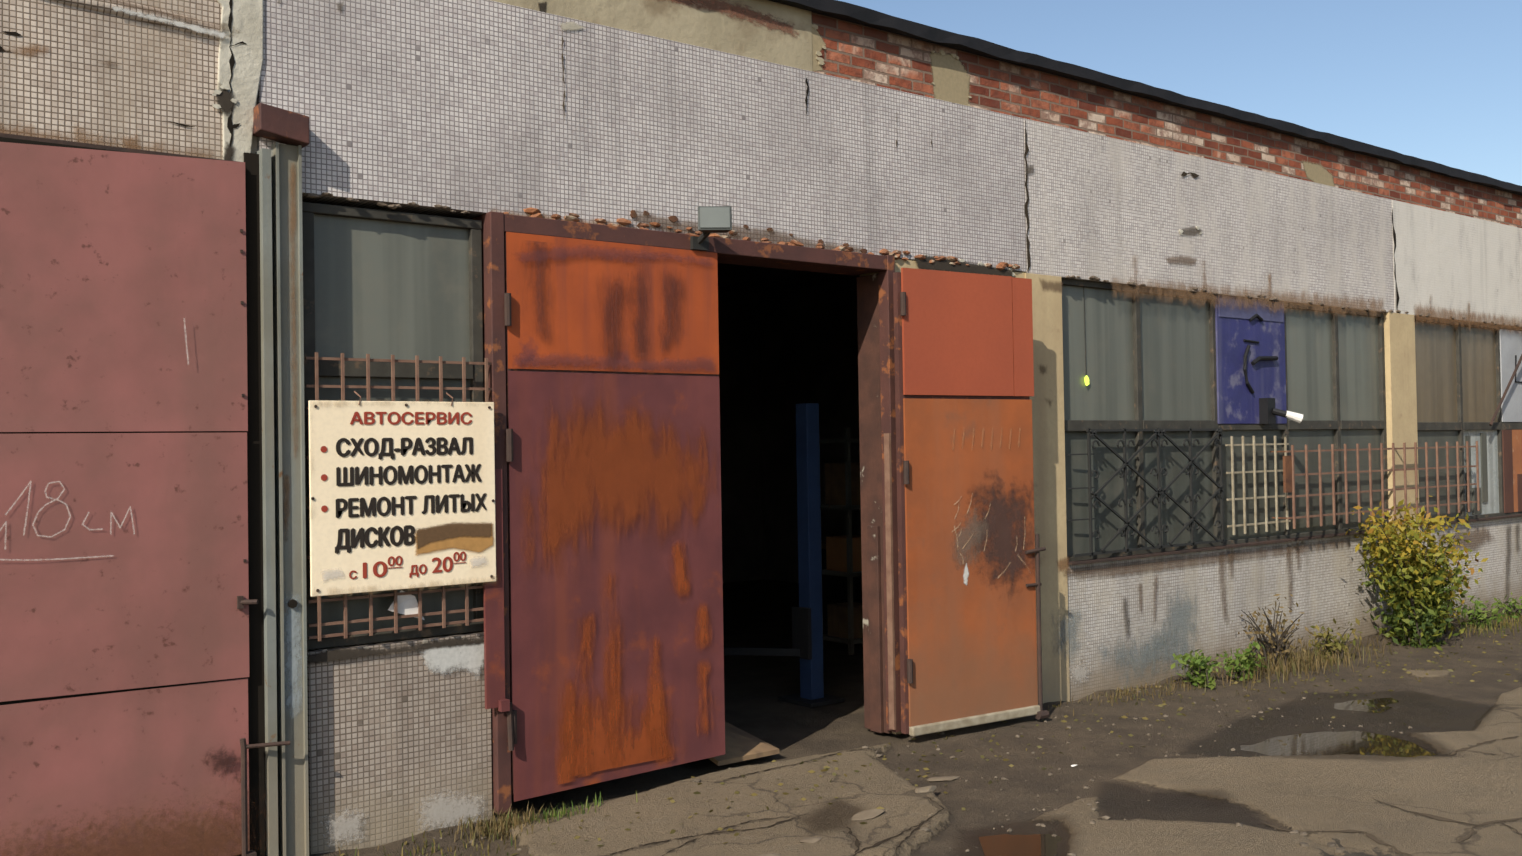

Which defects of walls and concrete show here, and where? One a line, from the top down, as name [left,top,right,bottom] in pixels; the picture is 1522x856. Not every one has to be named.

crack [169,0,246,145]
peeling [671,0,826,65]
crack [1023,121,1031,272]
corrosion [673,543,690,595]
corrosion [558,617,673,784]
corrosion [696,606,711,731]
crack [1449,736,1517,756]
crack [1263,823,1412,856]